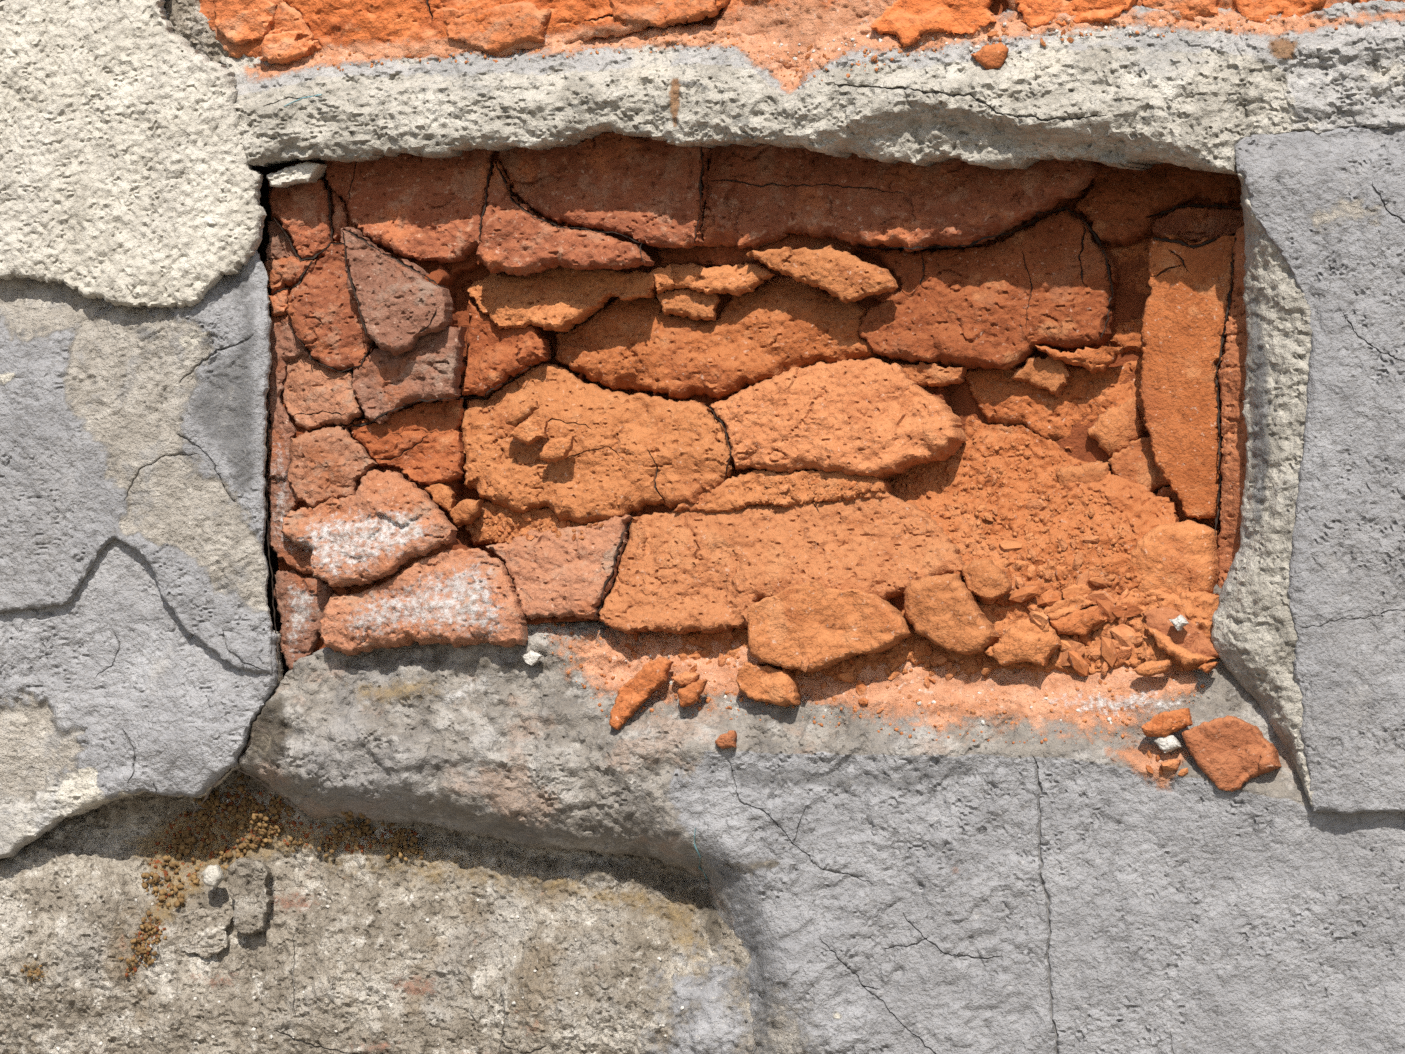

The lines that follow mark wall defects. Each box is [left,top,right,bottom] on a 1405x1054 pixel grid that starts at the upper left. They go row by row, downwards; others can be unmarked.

peeling [199,0,796,65]
peeling [818,0,997,47]
peeling [1015,0,1326,28]
spalling [0,131,1314,807]
water stain [137,814,413,919]
crack [732,769,863,881]
crack [887,917,1000,959]
crack [1035,759,1058,1054]
crack [826,944,936,1054]